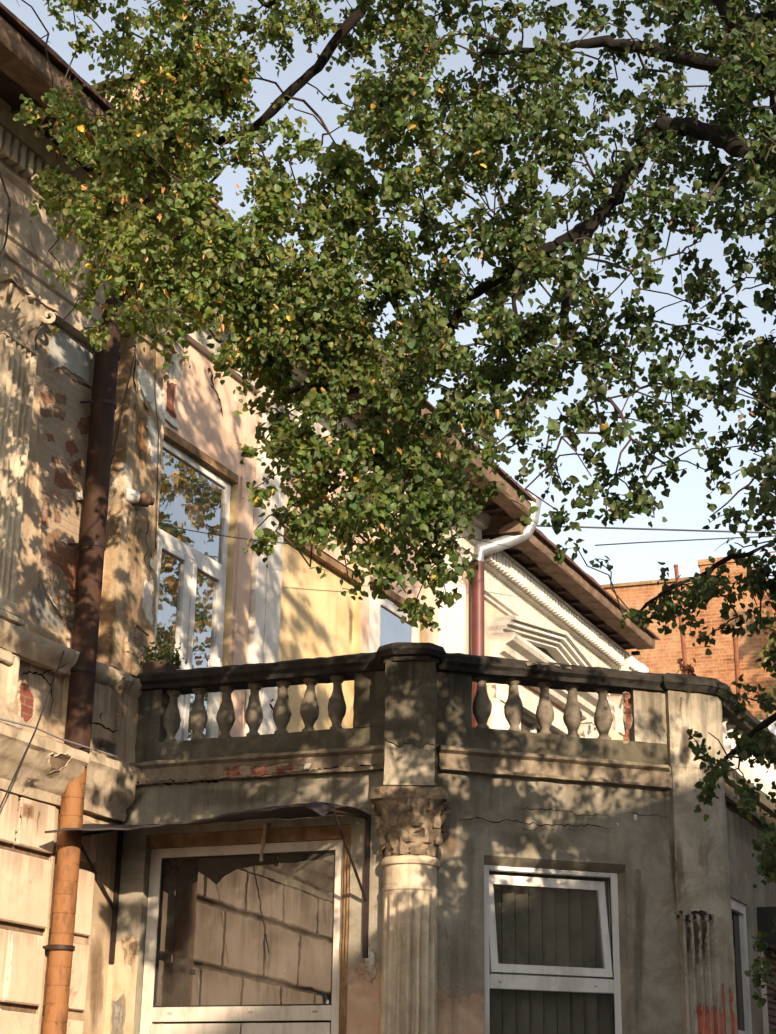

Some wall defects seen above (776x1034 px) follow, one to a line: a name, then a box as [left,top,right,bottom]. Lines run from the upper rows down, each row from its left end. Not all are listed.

crack [211,370,223,416]
flaking render [36,365,92,638]
flaking render [17,680,35,725]
crack [22,663,68,712]
flaking render [222,762,311,782]
crack [454,807,668,834]
leakage [687,918,707,957]